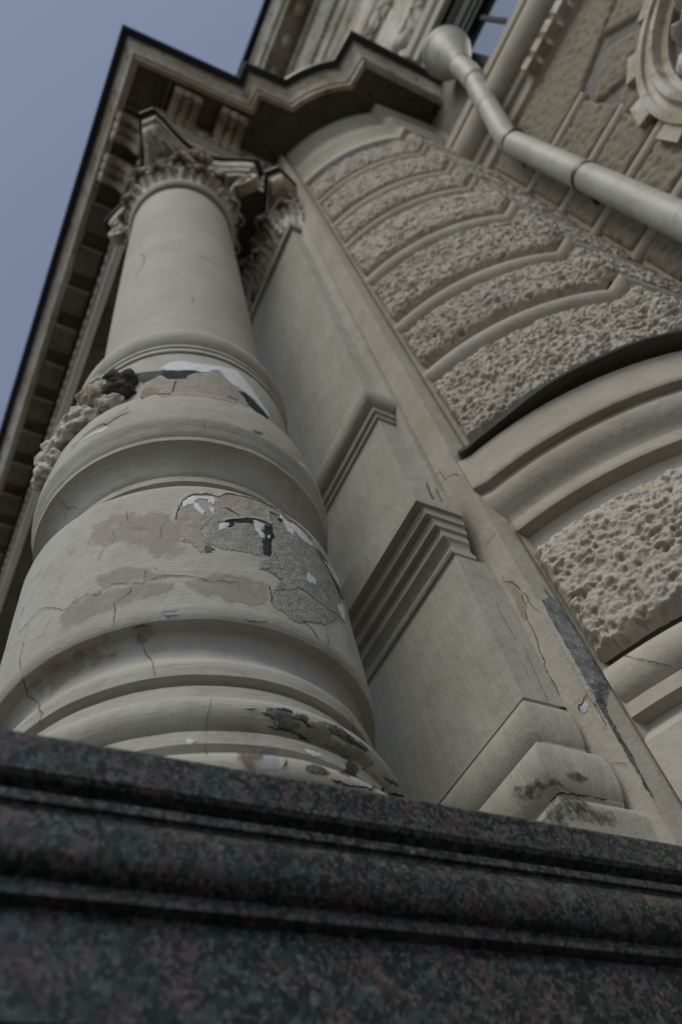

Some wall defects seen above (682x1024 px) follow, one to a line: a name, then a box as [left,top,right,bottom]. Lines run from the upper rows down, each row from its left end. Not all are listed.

peeling [135,361,271,419]
peeling [169,491,346,644]
crack [6,566,240,727]
spalling [243,707,404,797]
crack [477,574,559,694]
damp [515,773,587,799]
damp [556,797,611,826]
peeling [537,591,654,798]